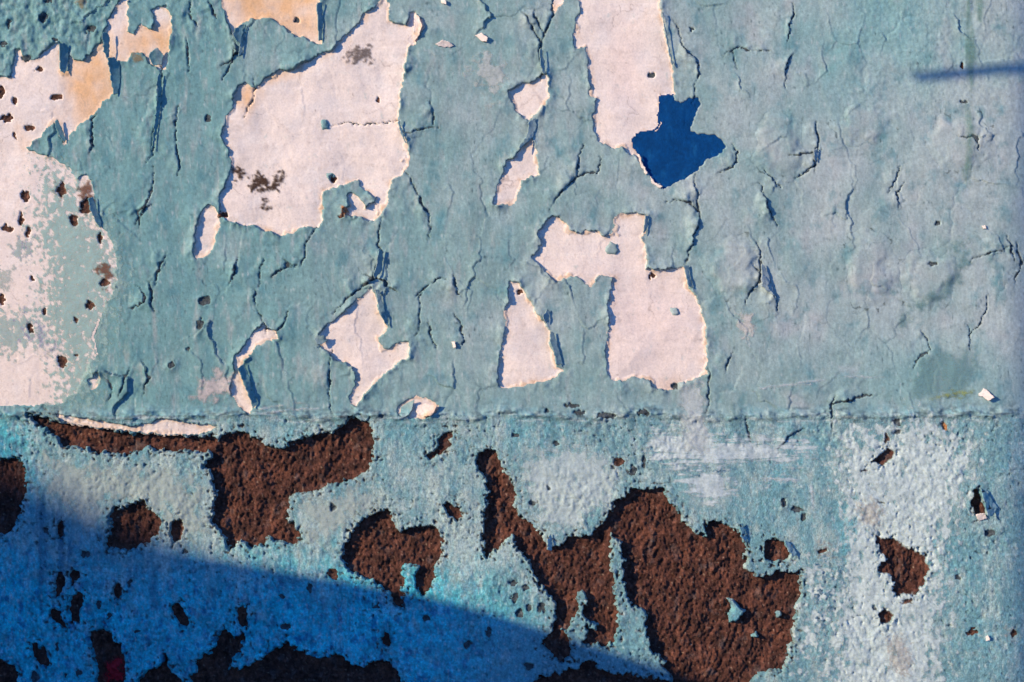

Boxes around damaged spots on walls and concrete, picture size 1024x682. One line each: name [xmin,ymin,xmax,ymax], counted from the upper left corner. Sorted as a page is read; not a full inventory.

crack [136,66,181,226]
crack [526,1,555,78]
peeling [573,0,726,189]
crack [759,124,820,226]
peeling [0,0,425,554]
crack [230,227,317,334]
crack [333,222,465,346]
peeling [532,212,708,390]
crack [829,394,872,426]
flaking render [326,509,445,607]
flaking render [476,449,801,682]
flaking render [875,535,930,604]